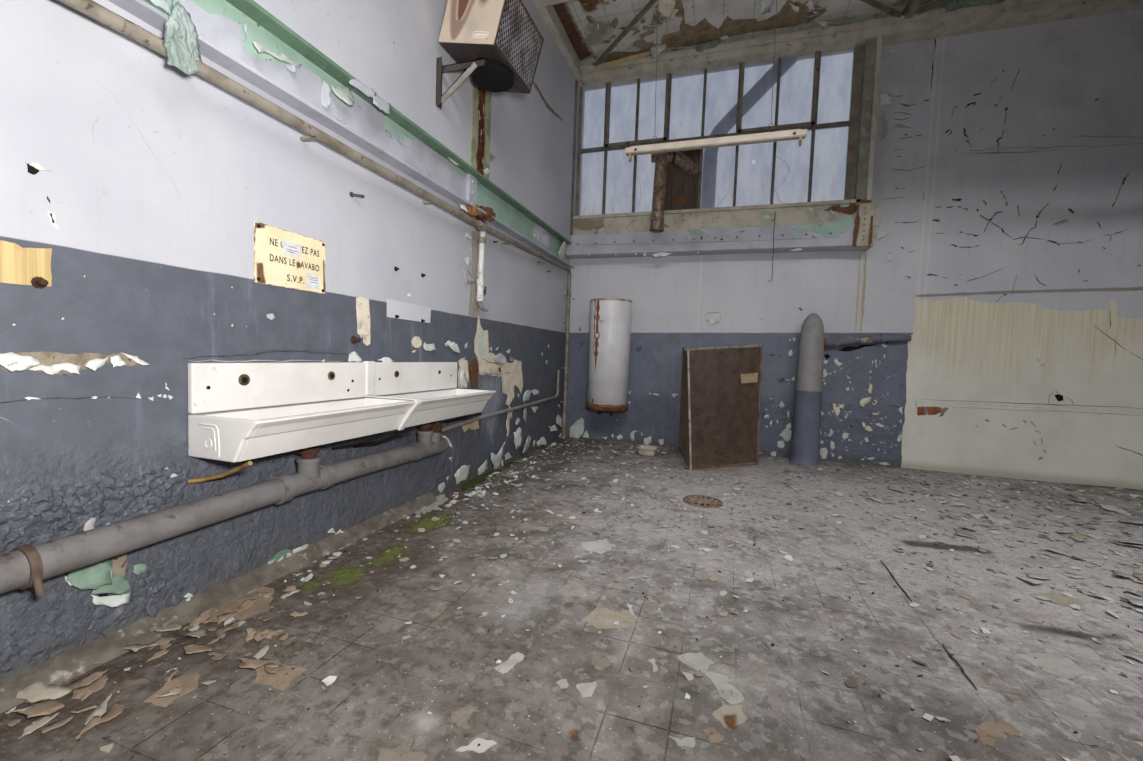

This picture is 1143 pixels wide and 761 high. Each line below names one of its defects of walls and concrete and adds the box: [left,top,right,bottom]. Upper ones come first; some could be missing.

peeling [945,0,1005,13]
peeling [583,0,855,67]
crack [887,39,937,262]
peeling [776,204,854,251]
peeling [348,297,370,362]
peeling [387,299,431,323]
peeling [0,351,150,375]
peeling [0,382,173,403]
flaking render [412,231,664,516]
peeling [819,267,1143,490]
peeling [83,517,96,531]
peeling [266,544,309,565]